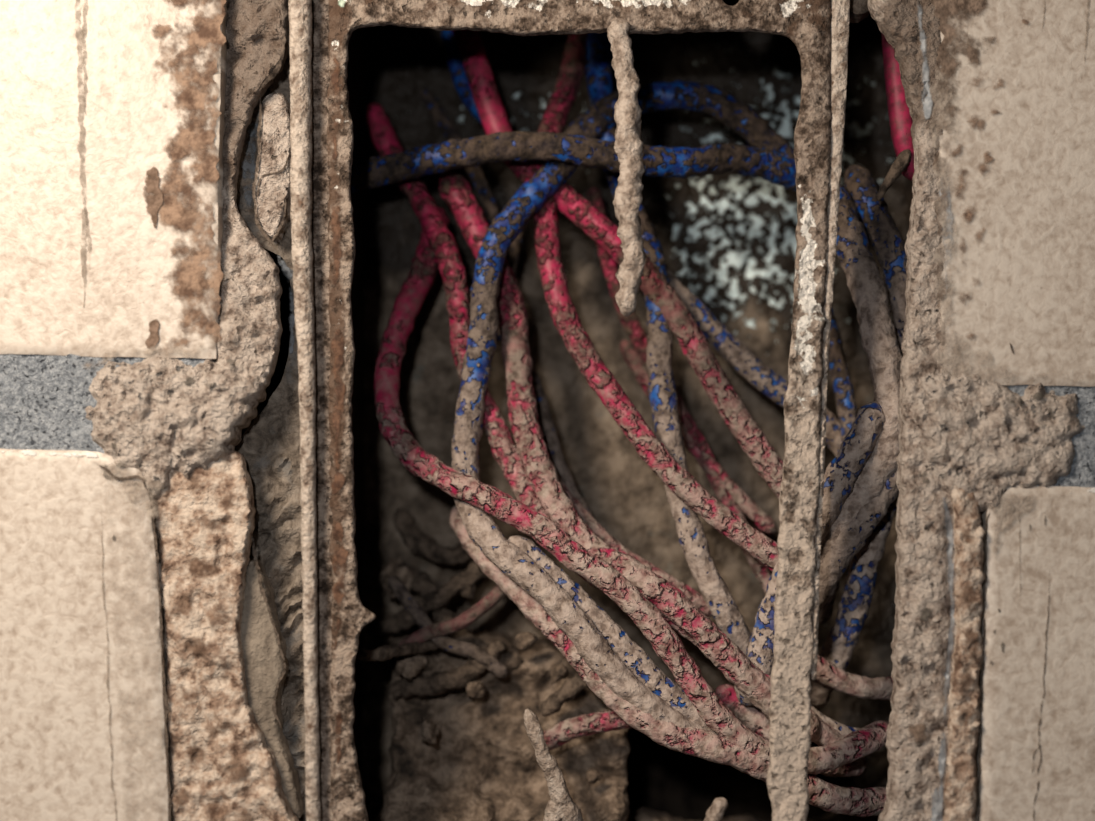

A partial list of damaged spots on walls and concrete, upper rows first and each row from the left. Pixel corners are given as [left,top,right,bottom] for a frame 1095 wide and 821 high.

spalling [144,0,226,351]
flaking render [254,92,291,242]
spalling [277,281,292,387]
peeling [189,557,217,576]
crack [99,465,171,821]
peeling [184,638,204,656]
peeling [187,746,205,761]
peeling [225,759,249,782]
flaking render [241,559,304,818]
spalling [962,630,979,691]
crack [977,514,990,821]
crack [1032,582,1050,820]